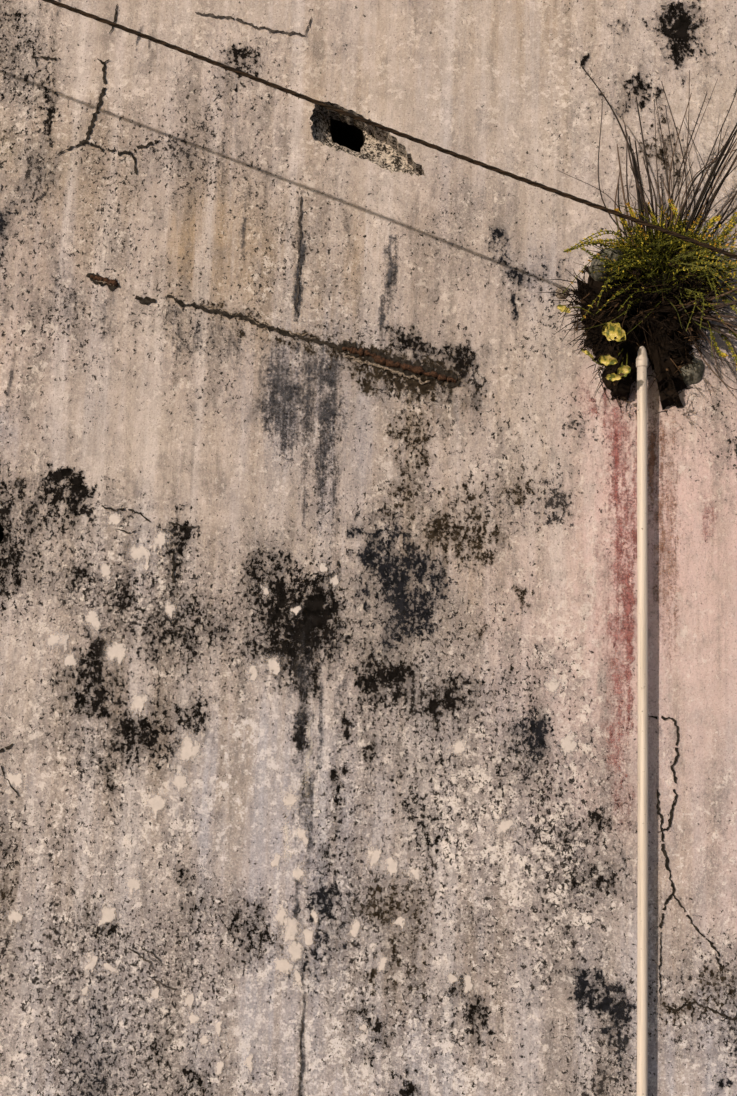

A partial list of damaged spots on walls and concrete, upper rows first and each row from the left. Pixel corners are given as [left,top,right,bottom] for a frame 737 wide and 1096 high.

crack [57,58,160,175]
water stain [293,199,306,315]
corrosion [342,346,456,383]
water stain [0,226,579,1096]
corrosion [593,391,676,796]
water stain [487,680,637,903]
crack [648,716,737,1022]
water stain [662,936,737,1056]